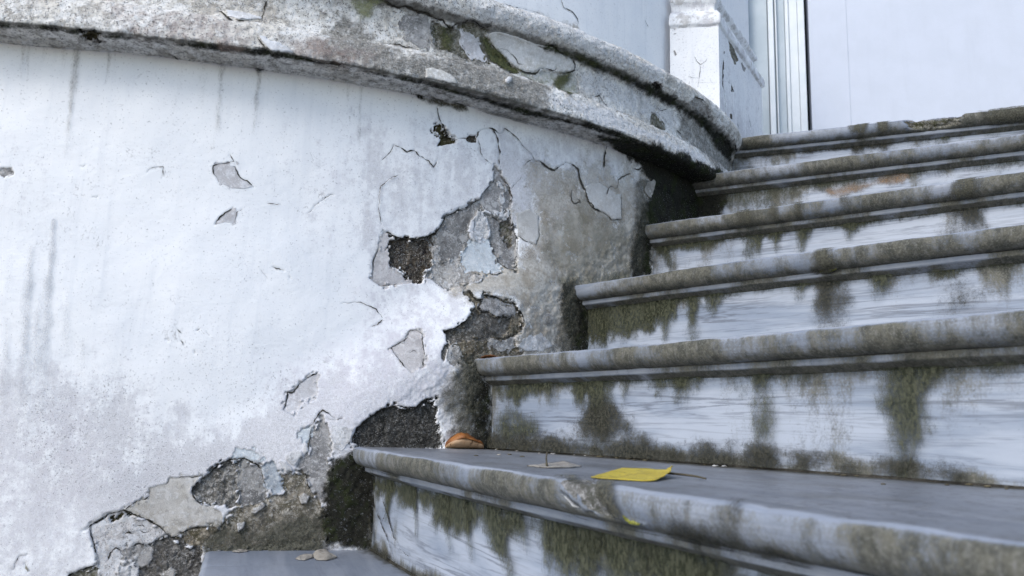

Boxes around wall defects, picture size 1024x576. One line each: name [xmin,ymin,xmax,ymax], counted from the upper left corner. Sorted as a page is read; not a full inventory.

flaking render [398,14,586,97]
flaking render [430,108,476,146]
peeling [215,208,241,225]
peeling [212,155,252,191]
peeling [584,183,622,221]
leakage [949,177,981,201]
flaking render [369,166,540,366]
leakage [812,248,840,275]
peeling [388,329,427,373]
flaking render [68,371,445,576]
leakage [202,445,396,555]
leakage [620,498,808,568]